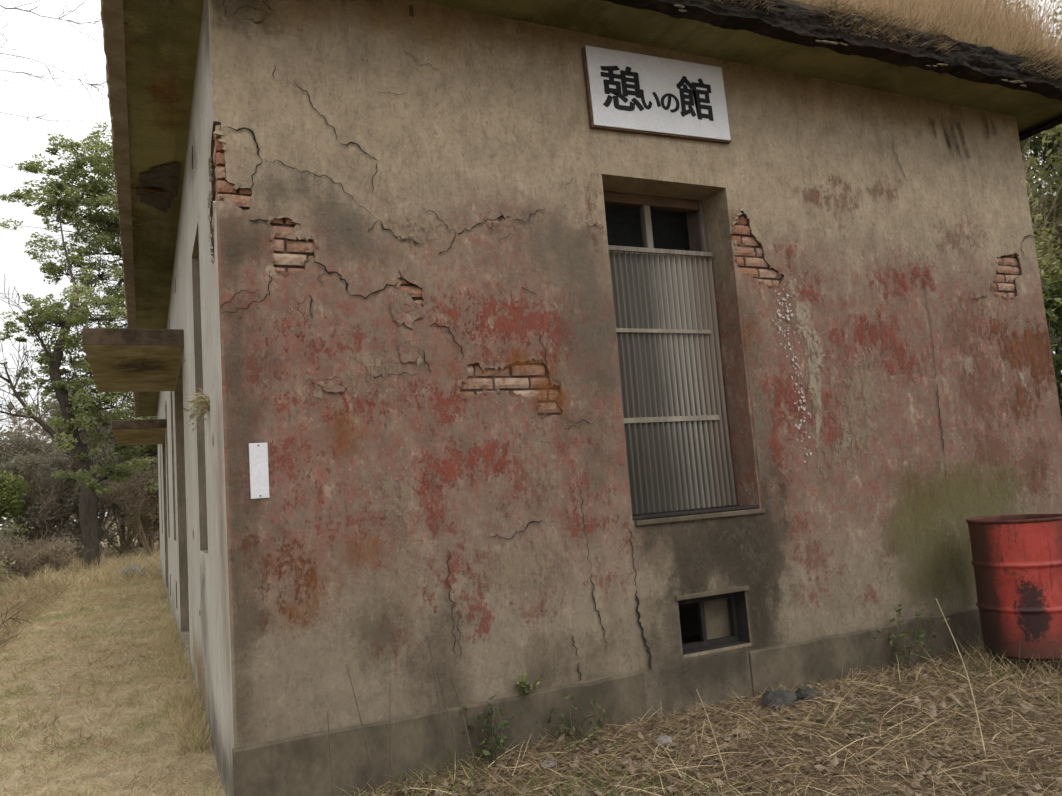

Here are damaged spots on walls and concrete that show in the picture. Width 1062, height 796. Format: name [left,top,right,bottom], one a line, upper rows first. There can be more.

spalling [136,162,181,213]
flaking render [208,125,251,263]
crack [220,272,273,314]
flaking render [267,215,318,277]
crack [297,261,402,321]
crack [207,65,545,255]
peeling [731,209,938,496]
peeling [980,252,1056,429]
peeling [228,274,634,663]
crack [446,549,462,660]
crack [580,486,607,650]
crack [627,526,652,669]